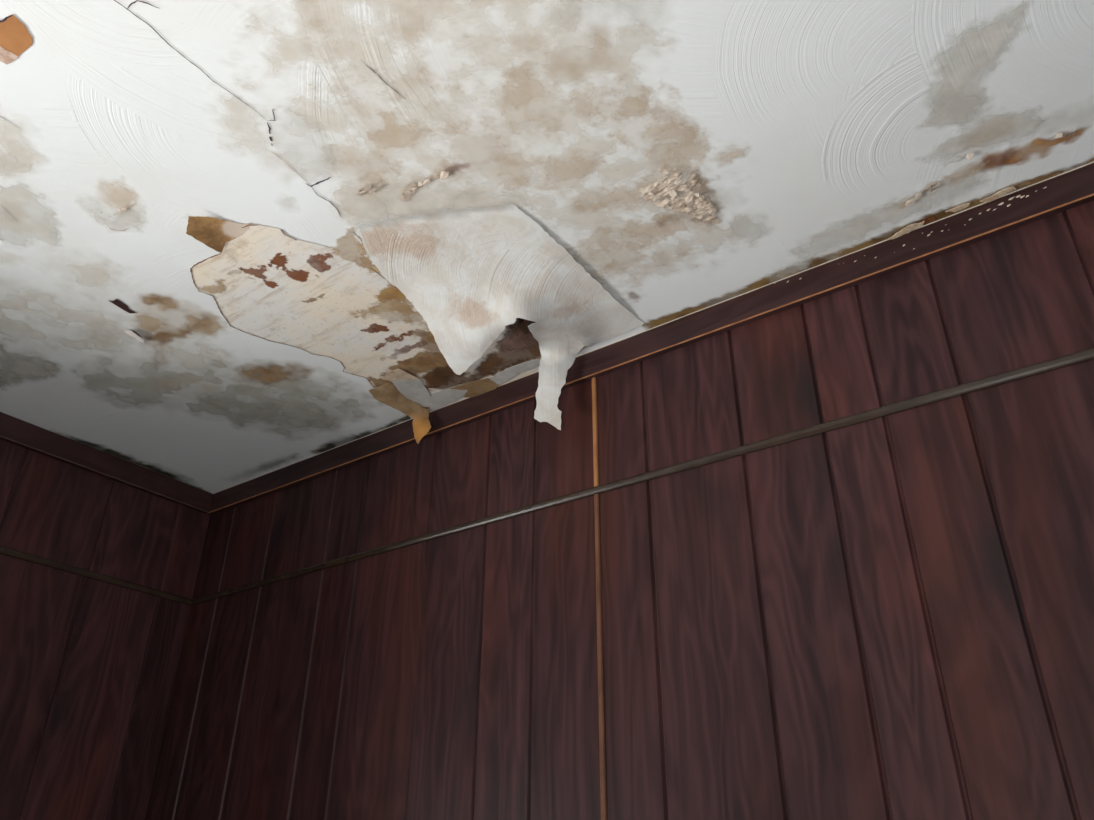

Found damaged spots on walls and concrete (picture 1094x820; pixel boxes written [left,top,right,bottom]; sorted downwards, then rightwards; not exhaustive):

peeling [0,14,33,65]
crack [114,0,341,217]
water stain [929,7,1043,157]
water stain [276,0,758,283]
water stain [0,185,56,244]
water stain [813,197,927,239]
water stain [138,295,220,342]
peeling [190,224,541,413]
water stain [0,345,58,385]
water stain [64,311,363,434]
water stain [313,416,412,453]